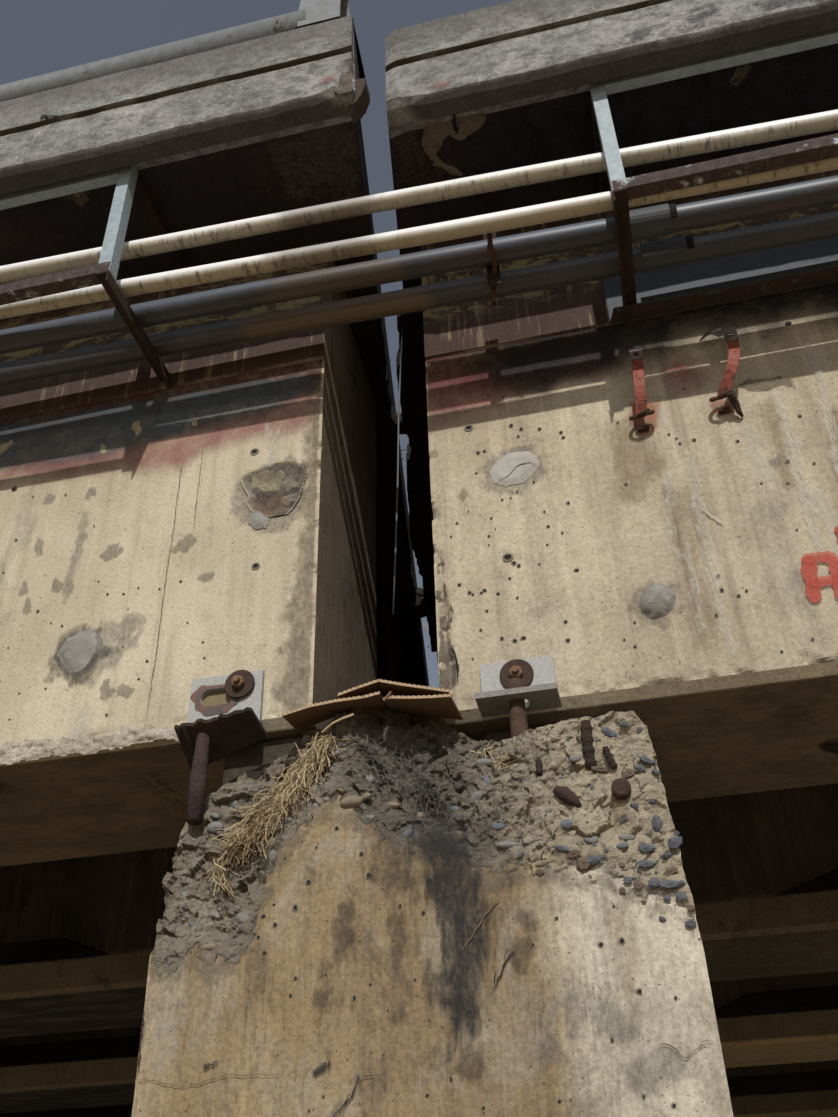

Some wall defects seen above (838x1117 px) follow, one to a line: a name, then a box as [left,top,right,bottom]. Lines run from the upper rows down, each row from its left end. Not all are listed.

spalling [421,113,486,176]
spalling [237,461,307,529]
corrosion [535,759,543,776]
corrosion [580,720,618,769]
corrosion [553,786,582,808]
spalling [151,708,696,981]
crack [333,1075,372,1117]